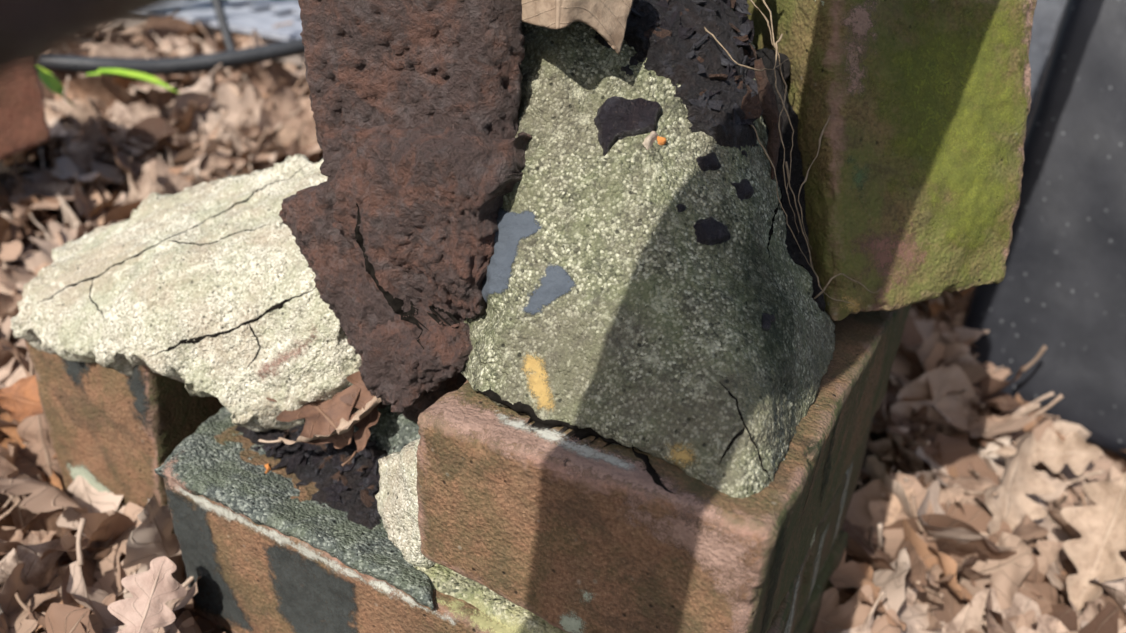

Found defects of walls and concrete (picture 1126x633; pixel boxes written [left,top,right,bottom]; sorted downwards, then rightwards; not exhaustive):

crack [149,288,315,369]
crack [719,381,772,482]
leakage [164,477,454,633]